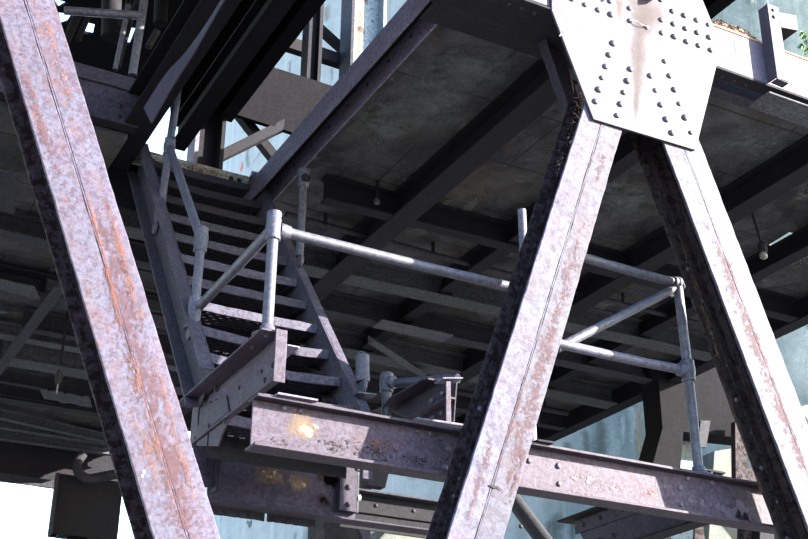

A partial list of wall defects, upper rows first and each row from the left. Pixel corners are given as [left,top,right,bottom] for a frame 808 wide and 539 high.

rust [355,0,371,52]
rust [22,73,61,174]
rust [90,202,197,536]
rust [499,224,585,502]
rust [713,237,805,468]
rust [467,441,492,514]
peeling [688,498,752,526]
rust [729,401,762,490]